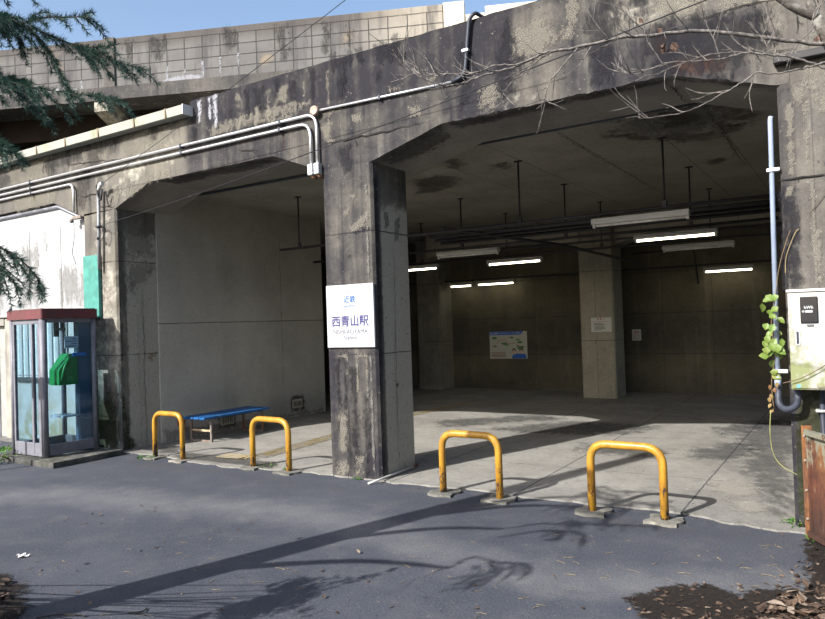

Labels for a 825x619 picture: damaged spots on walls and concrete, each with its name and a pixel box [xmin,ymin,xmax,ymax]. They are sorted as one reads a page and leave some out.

damp [163,61,204,82]
damp [192,68,315,141]
damp [323,25,364,103]
damp [373,33,405,78]
damp [495,22,524,99]
damp [573,0,779,100]
damp [611,104,751,142]
damp [778,186,802,289]
damp [336,353,375,472]